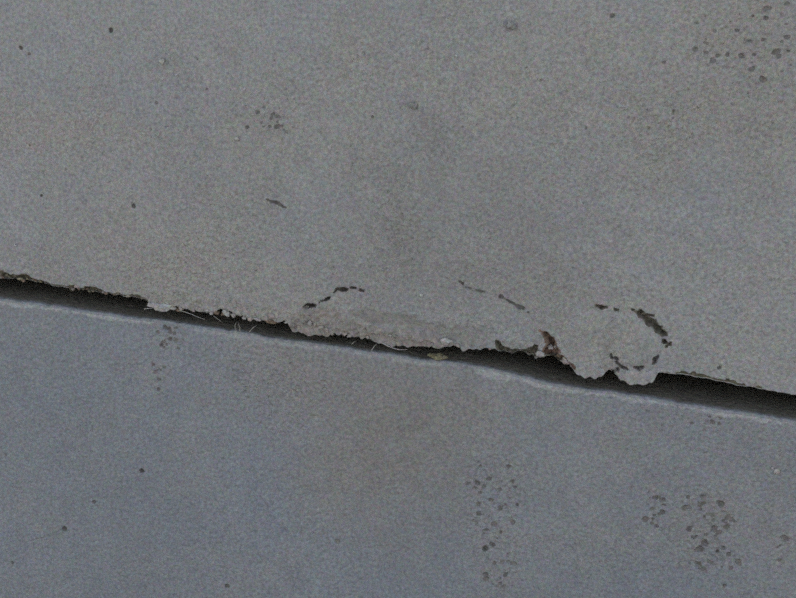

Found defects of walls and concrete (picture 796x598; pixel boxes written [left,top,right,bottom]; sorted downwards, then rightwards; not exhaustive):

crack [303,286,364,309]
peeling [147,296,664,385]
crack [594,304,672,373]